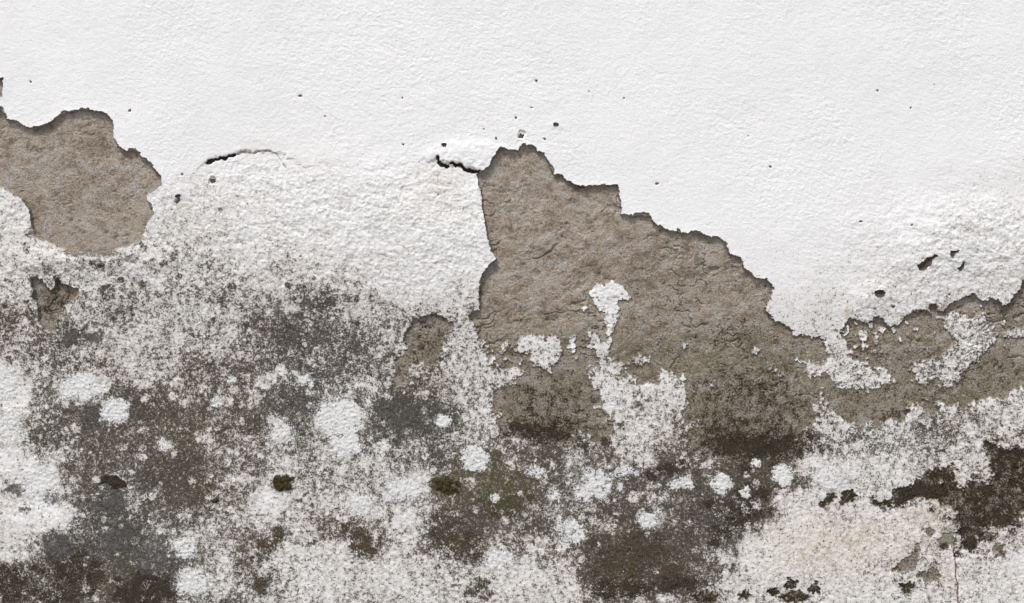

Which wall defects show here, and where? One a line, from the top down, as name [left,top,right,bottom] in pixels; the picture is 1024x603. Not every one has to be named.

spalling [0,77,162,254]
crack [206,149,286,168]
spalling [30,274,80,332]
spalling [439,134,1024,465]
water stain [60,330,107,347]
water stain [500,419,612,451]
mould [983,440,1023,457]
water stain [628,424,824,546]
mould [873,467,955,522]
water stain [0,474,196,603]
mould [938,514,1023,558]
mould [592,576,707,602]